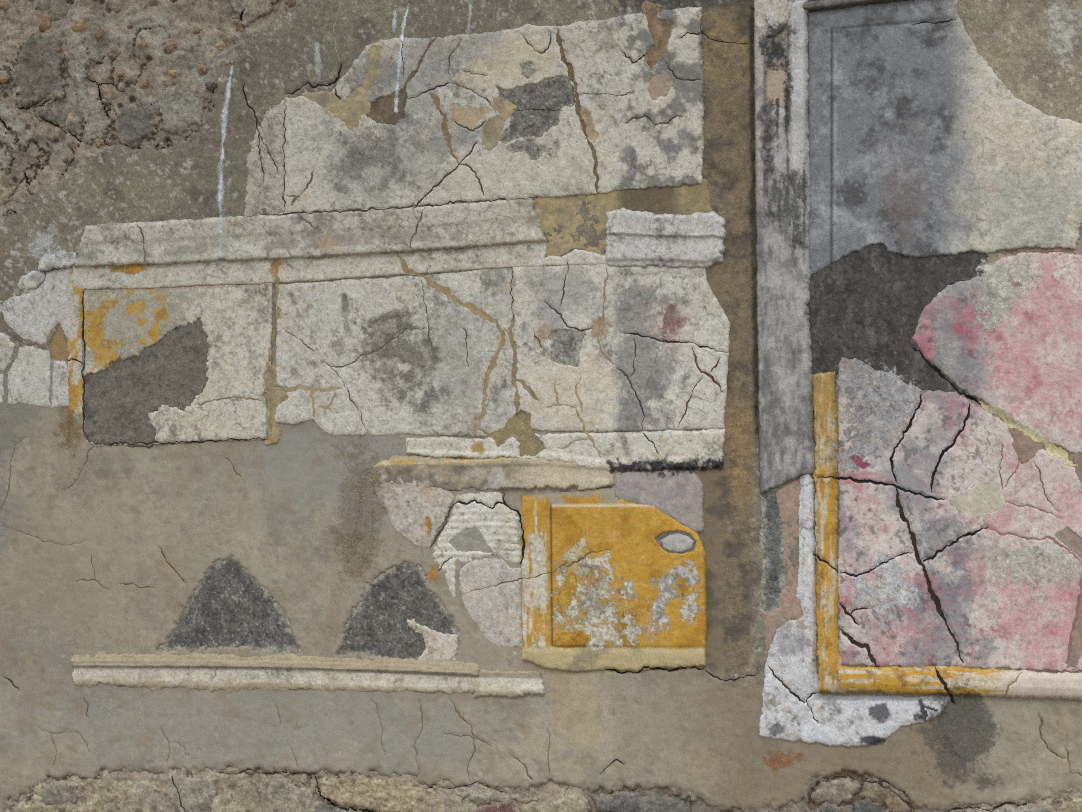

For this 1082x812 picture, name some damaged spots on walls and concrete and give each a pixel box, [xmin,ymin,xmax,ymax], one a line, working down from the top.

water stain [218,66,233,264]
crack [0,8,682,489]
spalling [302,42,408,130]
water stain [393,8,408,112]
spalling [450,62,600,160]
spalling [533,179,712,258]
water stain [758,19,806,244]
spalling [82,318,210,448]
crack [546,262,728,455]
spalling [807,243,1045,473]
crack [813,348,1082,704]
spalling [824,770,884,806]